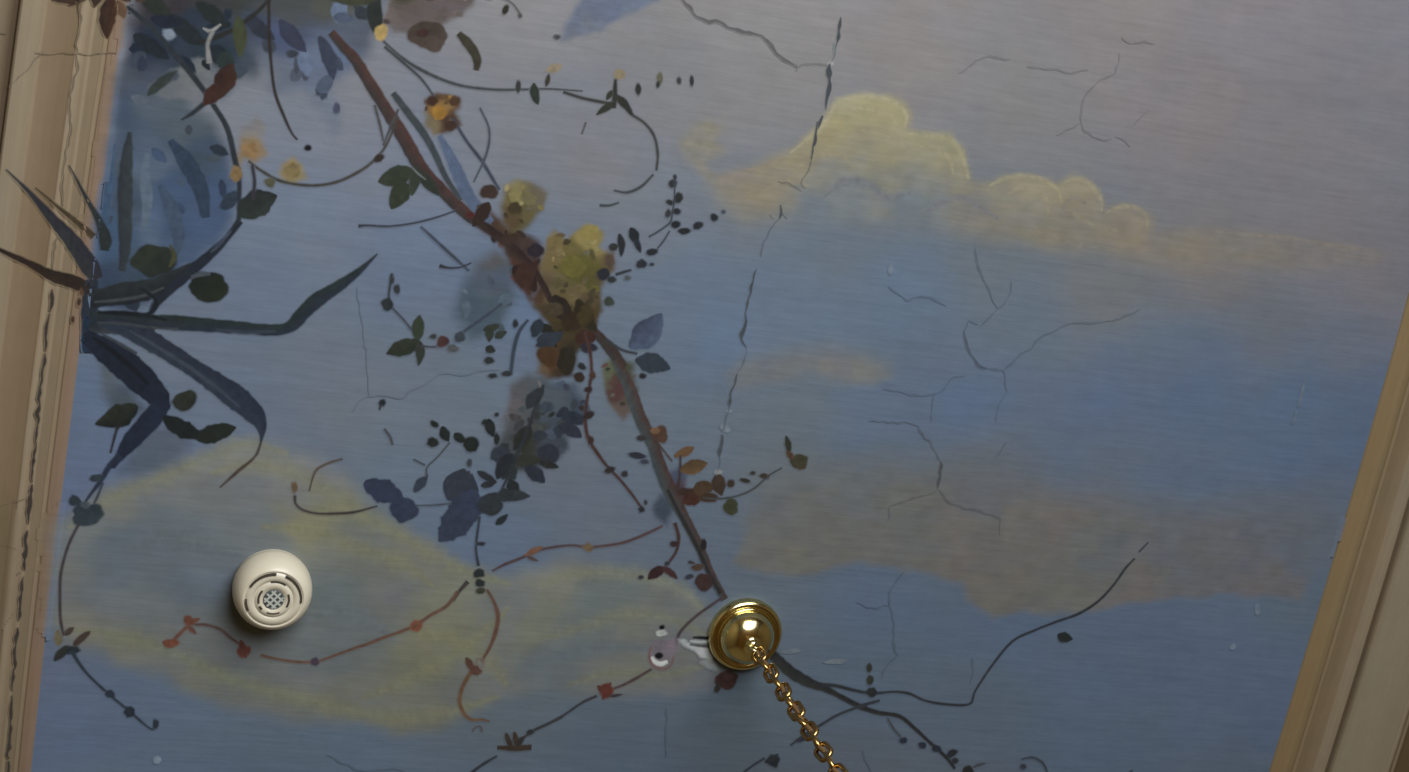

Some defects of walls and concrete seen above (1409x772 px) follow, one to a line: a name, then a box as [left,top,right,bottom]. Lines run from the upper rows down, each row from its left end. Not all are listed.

crack [0,0,116,772]
crack [681,0,842,479]
crack [872,247,1141,536]
crack [958,37,1154,147]